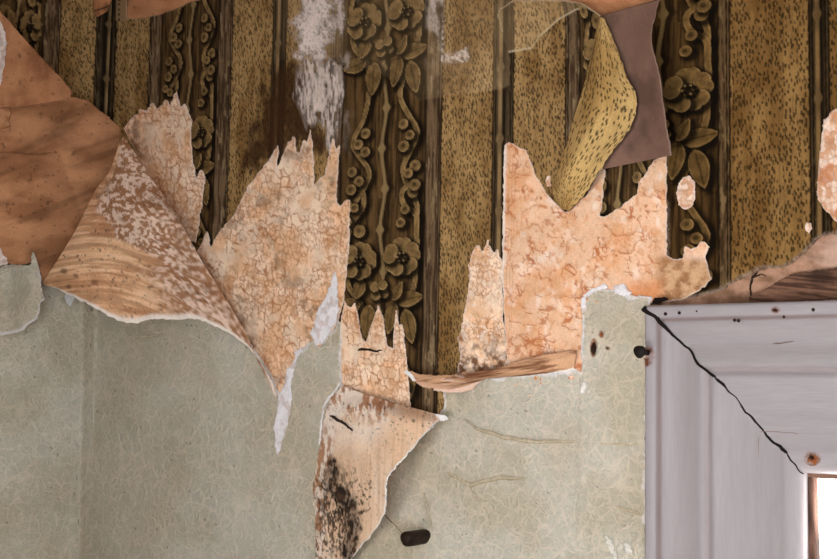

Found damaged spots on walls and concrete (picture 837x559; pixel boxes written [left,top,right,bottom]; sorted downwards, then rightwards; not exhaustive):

leakage [333,0,345,33]
crack [641,306,804,474]
mould [314,458,372,559]